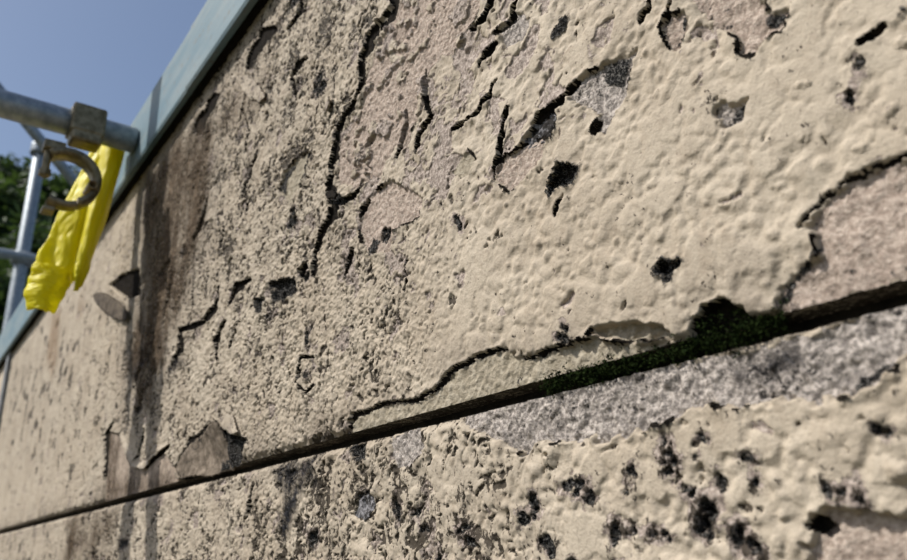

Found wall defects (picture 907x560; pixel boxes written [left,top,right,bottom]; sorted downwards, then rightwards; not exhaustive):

crack [245,0,306,70]
damp [129,133,210,408]
crack [165,264,252,369]
crack [310,0,400,278]
crack [395,0,518,180]
crack [529,79,581,143]
spalling [544,159,580,217]
peeling [781,153,907,314]
peeling [347,323,673,432]
spalling [465,305,907,476]
peeling [105,412,247,501]
peeling [805,483,907,560]